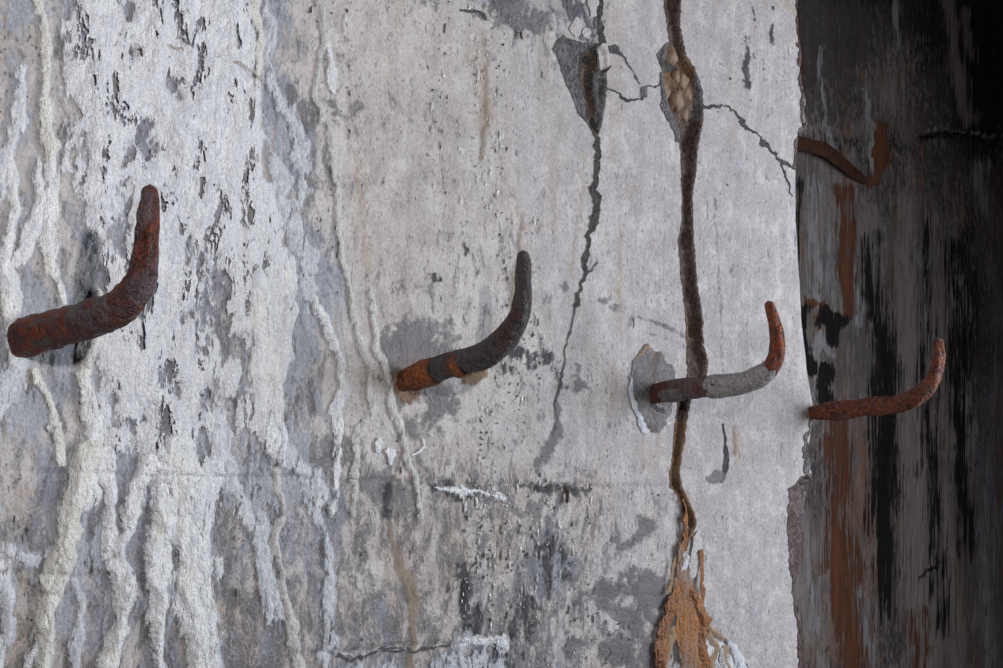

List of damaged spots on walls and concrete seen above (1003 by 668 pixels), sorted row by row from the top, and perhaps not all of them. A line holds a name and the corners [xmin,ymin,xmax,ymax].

crack [460,9,489,20]
spalling [553,0,611,138]
water stain [938,0,982,131]
water stain [0,0,670,668]
rust [401,357,472,391]
crack [535,136,627,475]
crack [596,0,796,564]
water stain [699,359,780,399]
water stain [794,86,1001,668]
crack [337,634,510,663]
rust [654,498,713,668]
water stain [706,623,750,668]